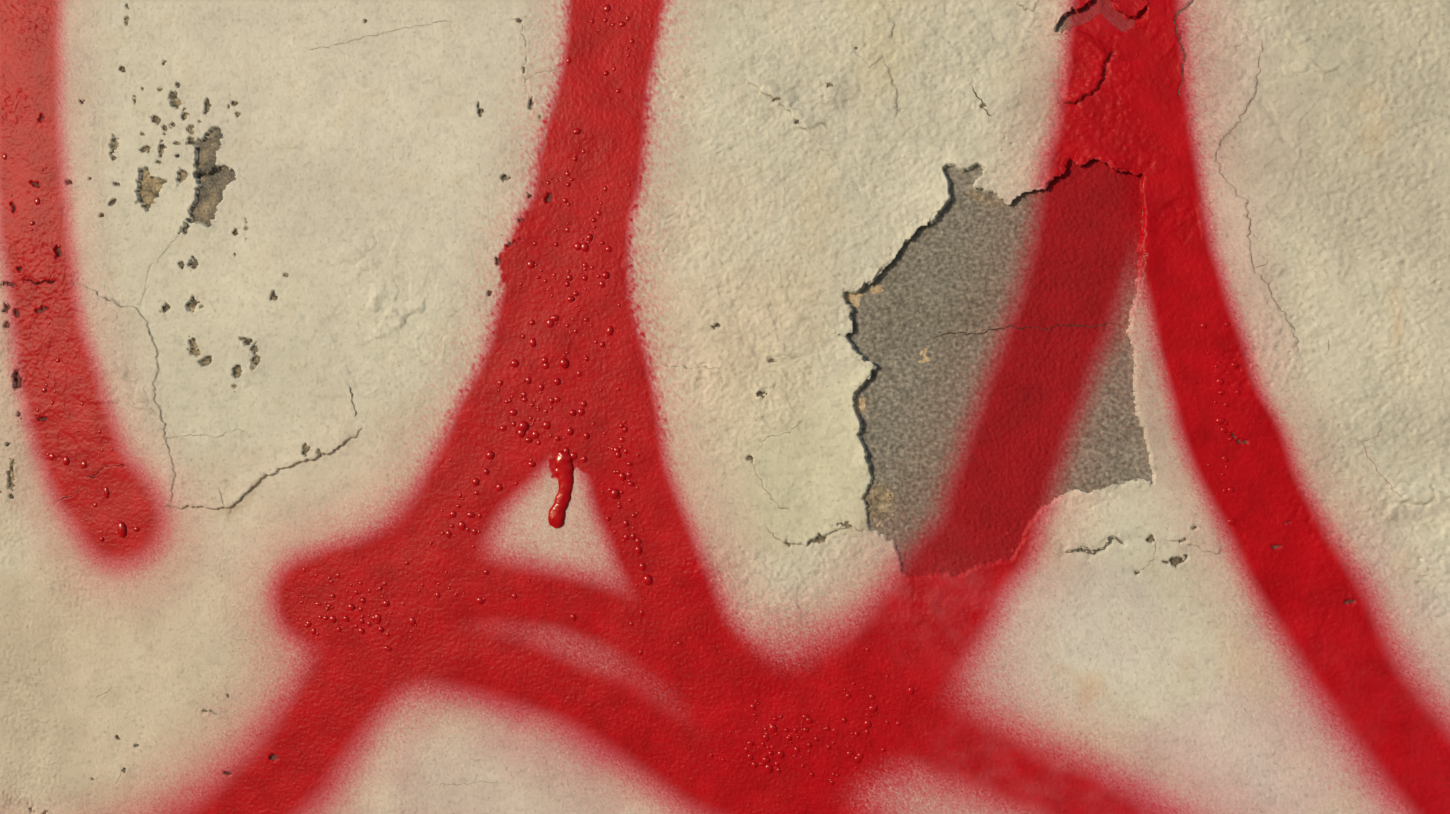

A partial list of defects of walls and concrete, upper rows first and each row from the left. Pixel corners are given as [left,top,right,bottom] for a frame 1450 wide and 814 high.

crack [1064,51,1114,104]
flaking render [133,83,236,234]
flaking render [0,267,49,328]
flaking render [162,297,204,313]
crack [5,236,362,515]
flaking render [189,336,212,366]
flaking render [232,337,260,392]
peeling [833,153,1153,546]
flaking render [1162,526,1197,567]